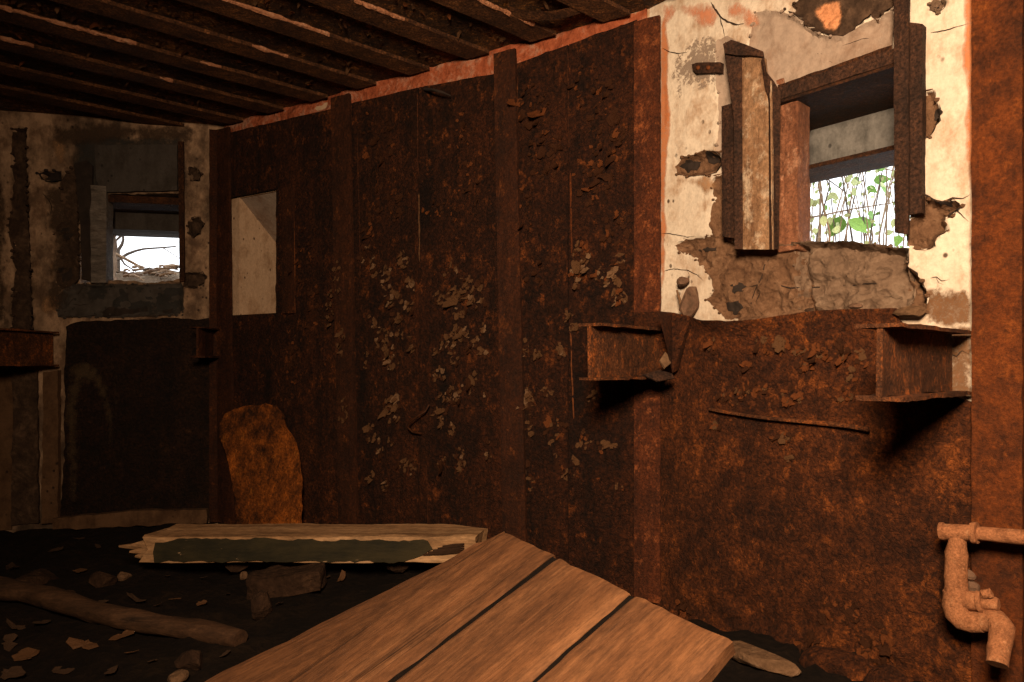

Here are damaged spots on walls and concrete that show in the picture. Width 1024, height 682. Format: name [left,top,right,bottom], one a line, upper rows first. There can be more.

crack [711,3,744,37]
peeling [748,0,894,87]
rust [964,0,972,165]
rust [567,61,626,207]
spalling [672,36,966,320]
rust [357,243,416,370]
rust [568,210,630,307]
rust [430,257,489,475]
rust [715,335,869,407]
rust [362,392,401,493]
rust [516,386,618,481]
rust [793,596,894,666]